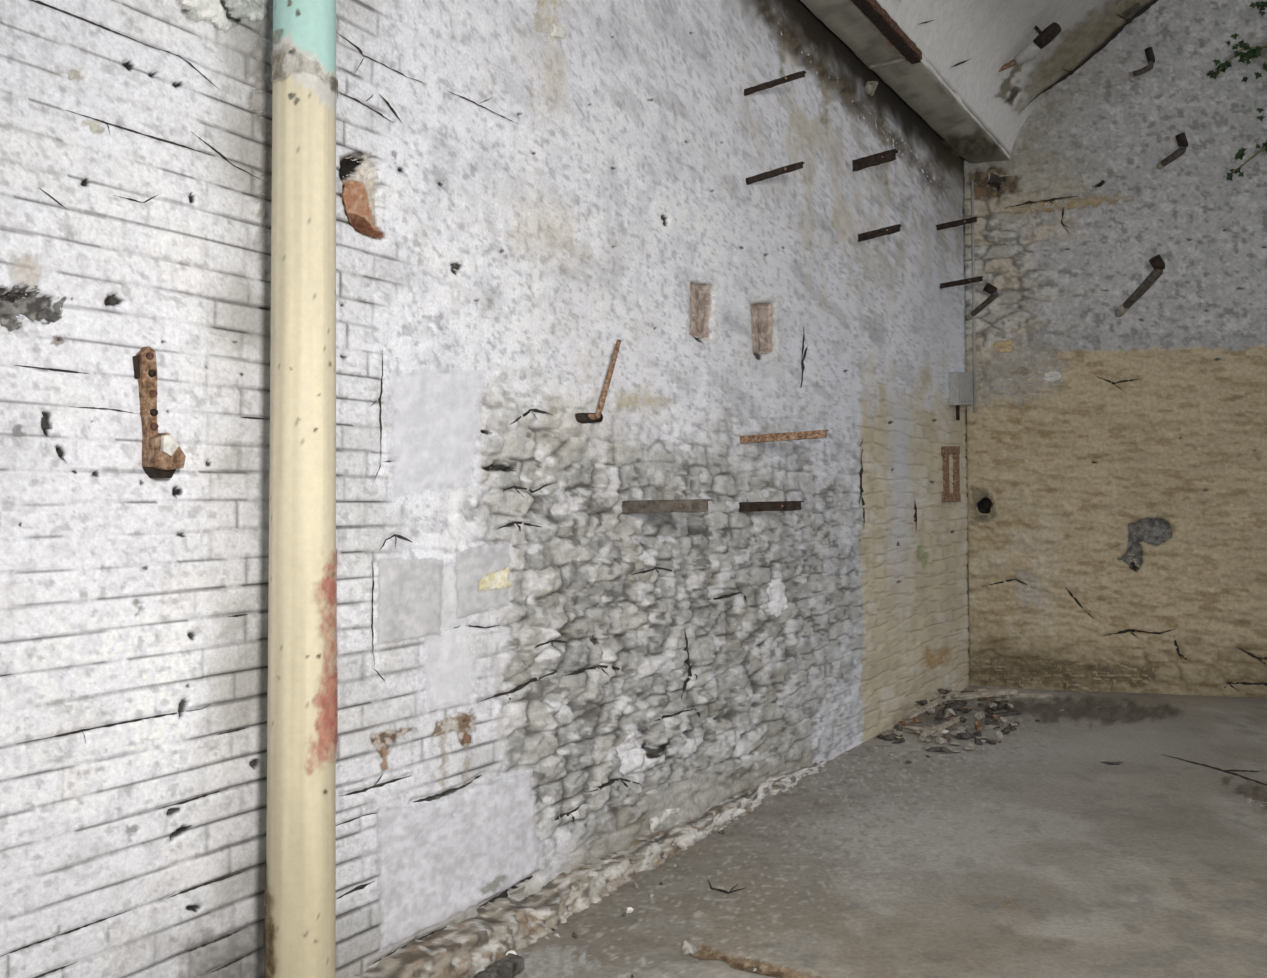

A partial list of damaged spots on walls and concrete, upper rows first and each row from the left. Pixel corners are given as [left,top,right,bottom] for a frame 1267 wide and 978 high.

peeling [179,0,338,233]
spalling [339,153,384,240]
spalling [0,259,73,331]
spalling [1117,518,1172,571]
crack [1065,587,1189,663]
crack [1221,646,1267,691]
rust [371,728,412,770]
rust [433,713,475,783]
water stain [482,877,505,892]
water stain [515,946,600,978]